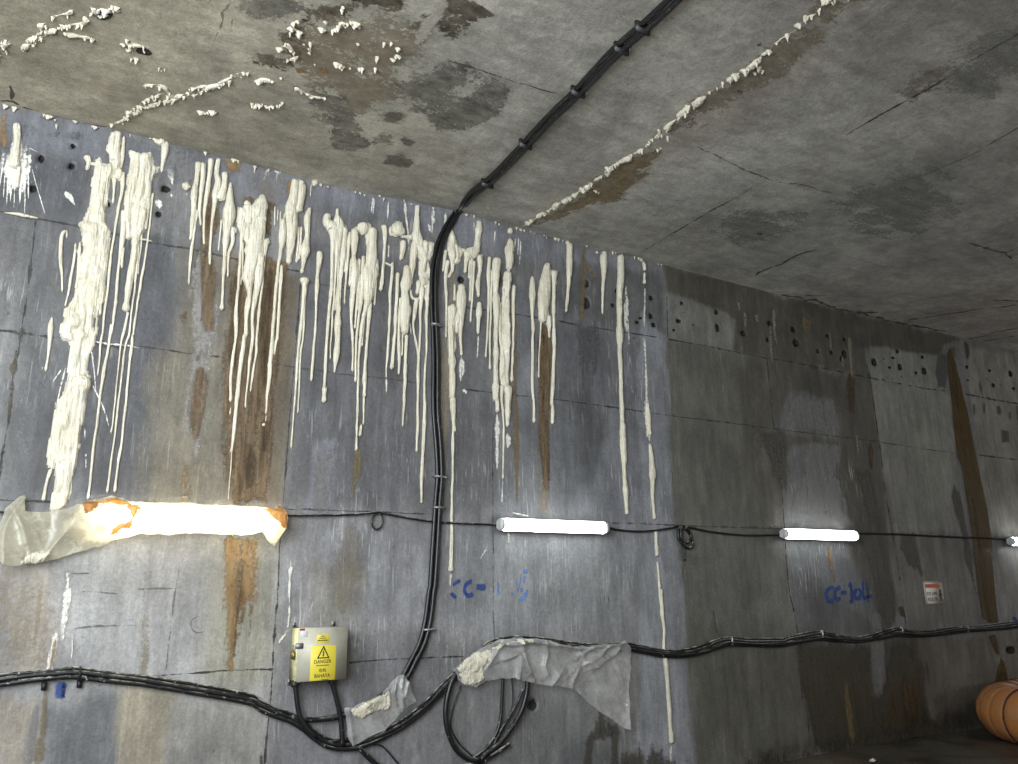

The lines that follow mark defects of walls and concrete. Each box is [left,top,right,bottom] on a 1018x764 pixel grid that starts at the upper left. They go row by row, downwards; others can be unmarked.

damp [0,5,122,57]
damp [0,104,45,219]
damp [826,166,962,238]
rust [189,356,208,439]
rust [200,187,288,505]
damp [41,0,848,585]
rust [537,323,553,491]
rust [222,536,259,671]
damp [952,485,975,588]
rust [948,350,1008,682]